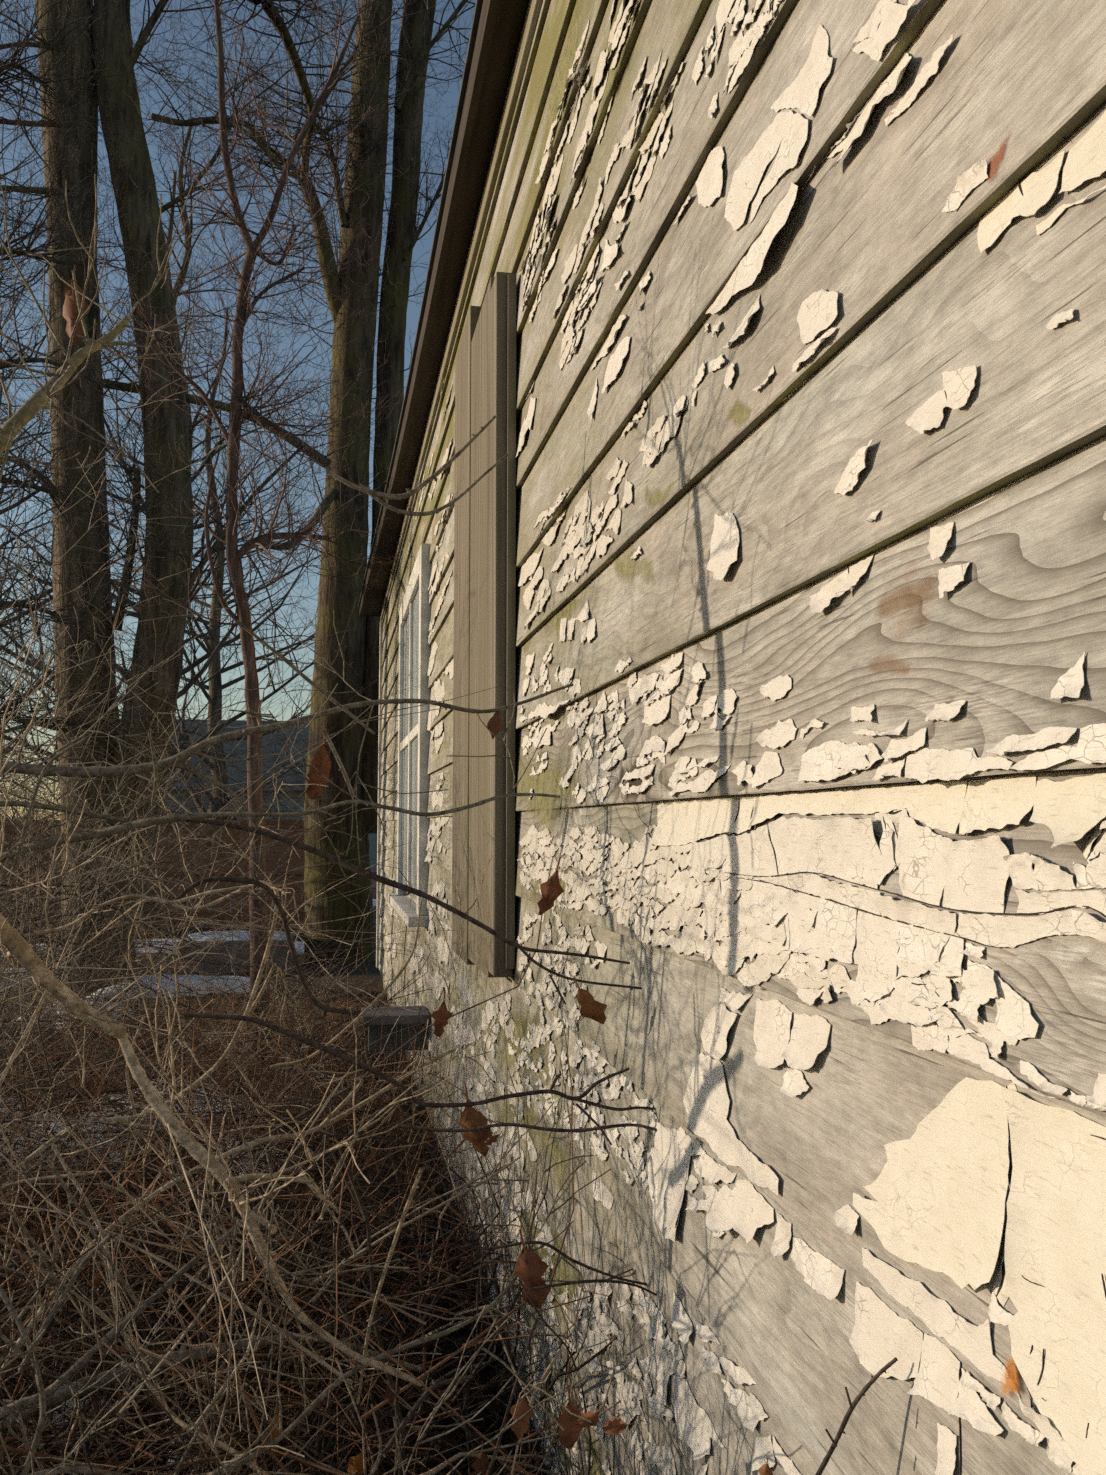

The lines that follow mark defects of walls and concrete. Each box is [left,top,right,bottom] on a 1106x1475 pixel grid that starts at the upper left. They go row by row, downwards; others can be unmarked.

peeling [942,160,989,212]
peeling [977,110,1106,255]
peeling [516,0,956,630]
peeling [1046,309,1075,330]
peeling [905,365,977,434]
peeling [380,378,1106,1475]
crack [707,798,1106,948]
crack [993,1082,1045,1306]
crack [1026,1345,1046,1409]